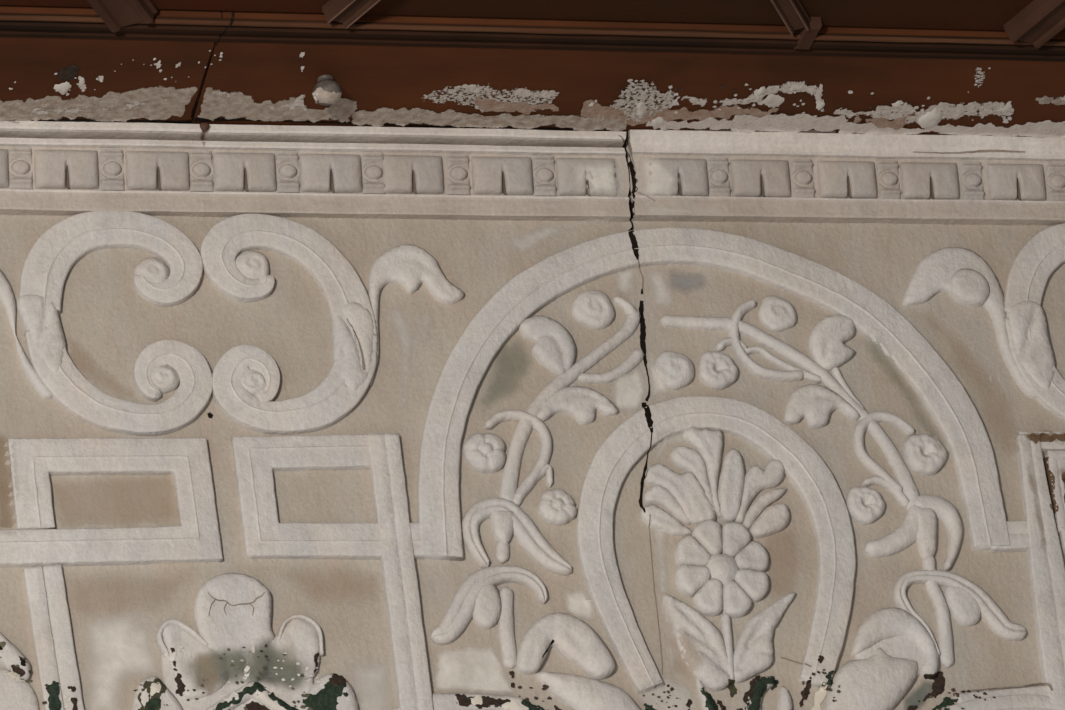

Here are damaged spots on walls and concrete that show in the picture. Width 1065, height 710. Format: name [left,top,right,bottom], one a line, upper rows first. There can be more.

peeling [54,58,181,96]
crack [1,12,574,130]
crack [600,128,663,675]
peeling [0,641,32,682]
peeling [42,681,78,710]
peeling [133,644,348,710]
leakage [197,644,300,686]
peeling [455,671,574,710]
peeling [643,675,779,710]
peeling [791,655,841,710]
peeling [908,671,996,710]